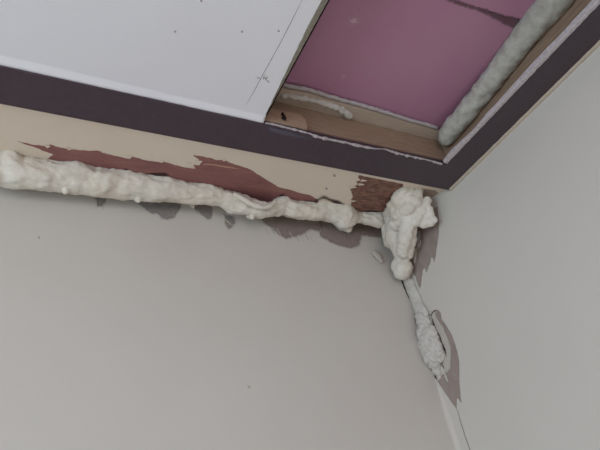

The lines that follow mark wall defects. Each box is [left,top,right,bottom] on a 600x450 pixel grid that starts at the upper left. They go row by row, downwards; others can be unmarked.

peeling [18,141,318,203]
peeling [350,175,403,213]
peeling [410,208,439,287]
crack [414,310,446,379]
peeling [429,310,462,409]